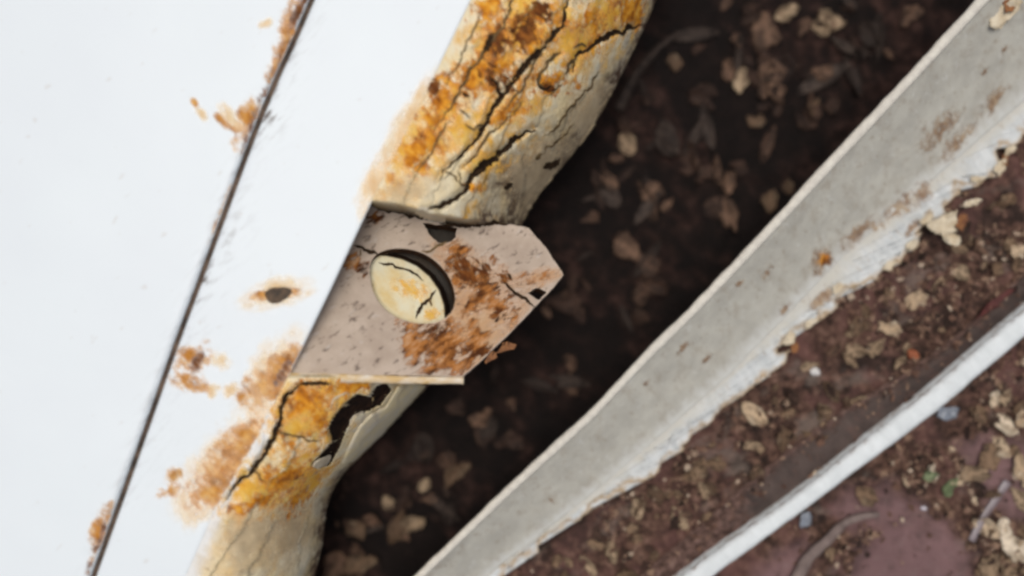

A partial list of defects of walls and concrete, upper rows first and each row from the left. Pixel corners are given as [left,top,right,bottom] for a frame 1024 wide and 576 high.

rust [191,0,307,153]
rust [364,0,647,196]
rust [343,247,369,277]
rust [364,210,384,225]
rust [393,240,554,376]
crack [354,0,642,318]
peeling [782,319,818,354]
peeling [919,198,982,247]
peeling [970,145,1017,183]
rust [157,469,183,497]
rust [172,344,370,521]
crack [226,381,330,500]